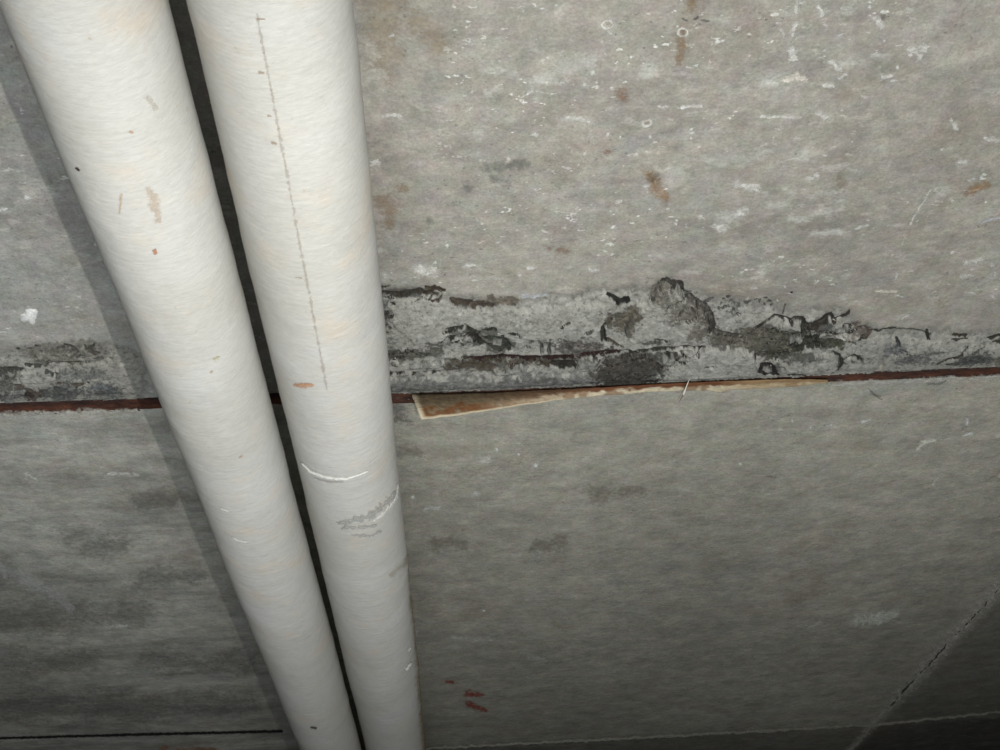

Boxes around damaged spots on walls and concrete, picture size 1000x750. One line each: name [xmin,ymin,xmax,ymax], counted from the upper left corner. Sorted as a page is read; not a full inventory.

spalling [0,339,146,403]
spalling [381,277,896,420]